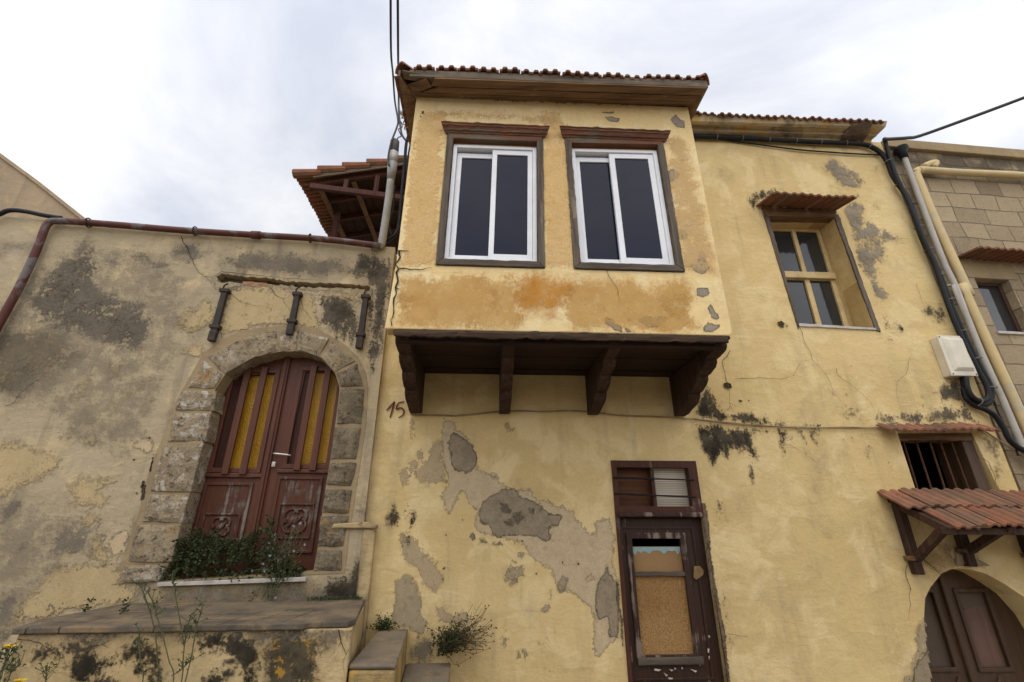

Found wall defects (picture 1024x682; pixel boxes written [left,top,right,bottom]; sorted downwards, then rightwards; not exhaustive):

peeling [666,115,715,274]
leakage [0,241,152,391]
crack [181,236,311,319]
leakage [220,252,391,371]
peeling [697,288,720,332]
mould [696,386,820,484]
crack [722,326,874,411]
mould [876,381,979,424]
peeling [391,418,624,657]
leakage [31,630,352,682]